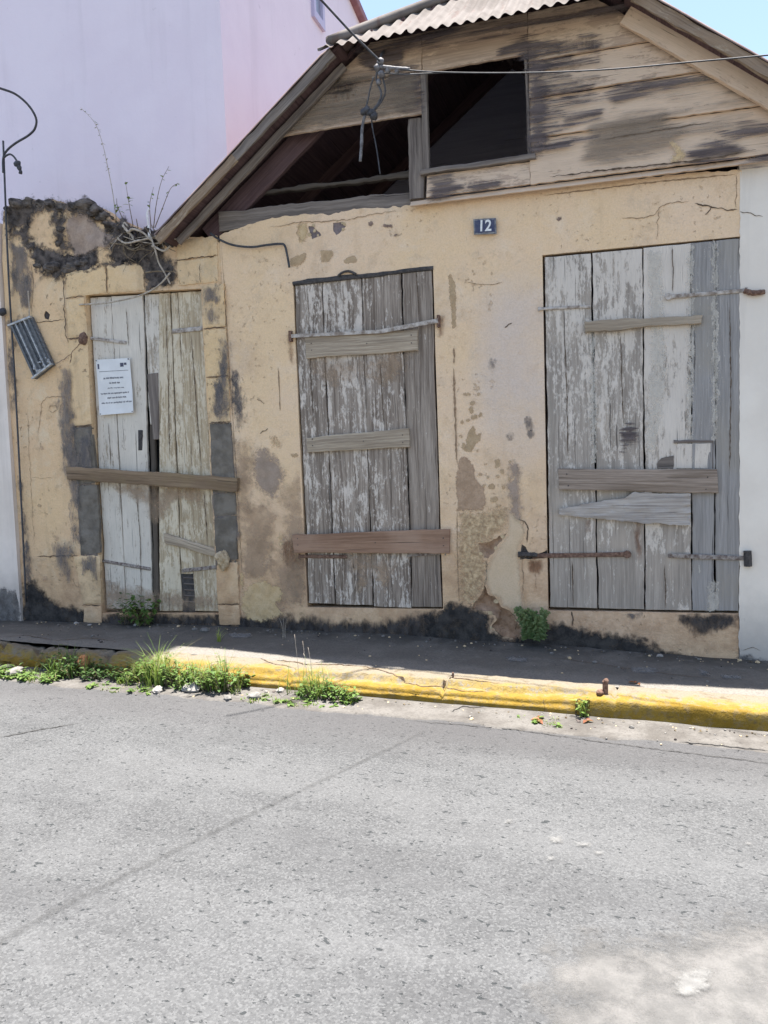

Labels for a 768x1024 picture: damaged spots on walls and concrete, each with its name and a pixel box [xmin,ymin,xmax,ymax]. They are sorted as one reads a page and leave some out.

crack [550,149,763,239]
peeling [61,214,116,267]
water stain [58,369,95,507]
water stain [0,515,84,622]
water stain [53,528,98,580]
peeling [455,392,522,639]
water stain [102,602,680,655]
water stain [679,614,734,634]